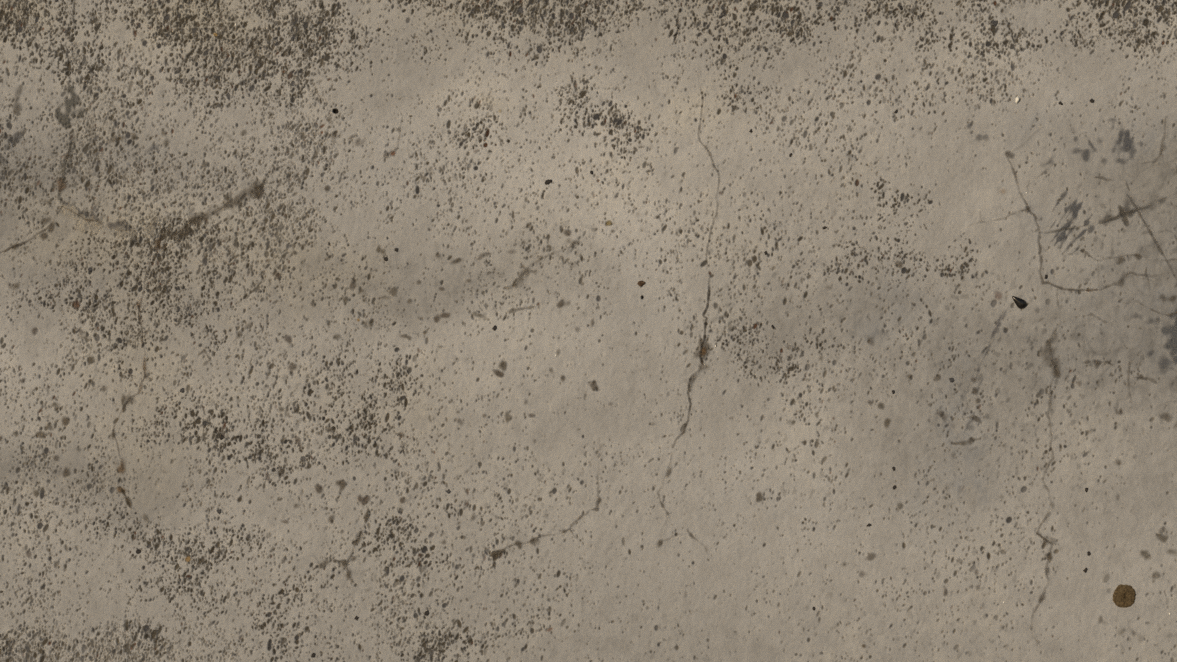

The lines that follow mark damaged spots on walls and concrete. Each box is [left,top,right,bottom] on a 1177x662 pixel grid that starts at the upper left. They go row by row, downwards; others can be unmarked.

crack [1027,206,1091,291]
crack [1103,206,1152,284]
crack [685,287,710,427]
crack [1047,342,1060,377]